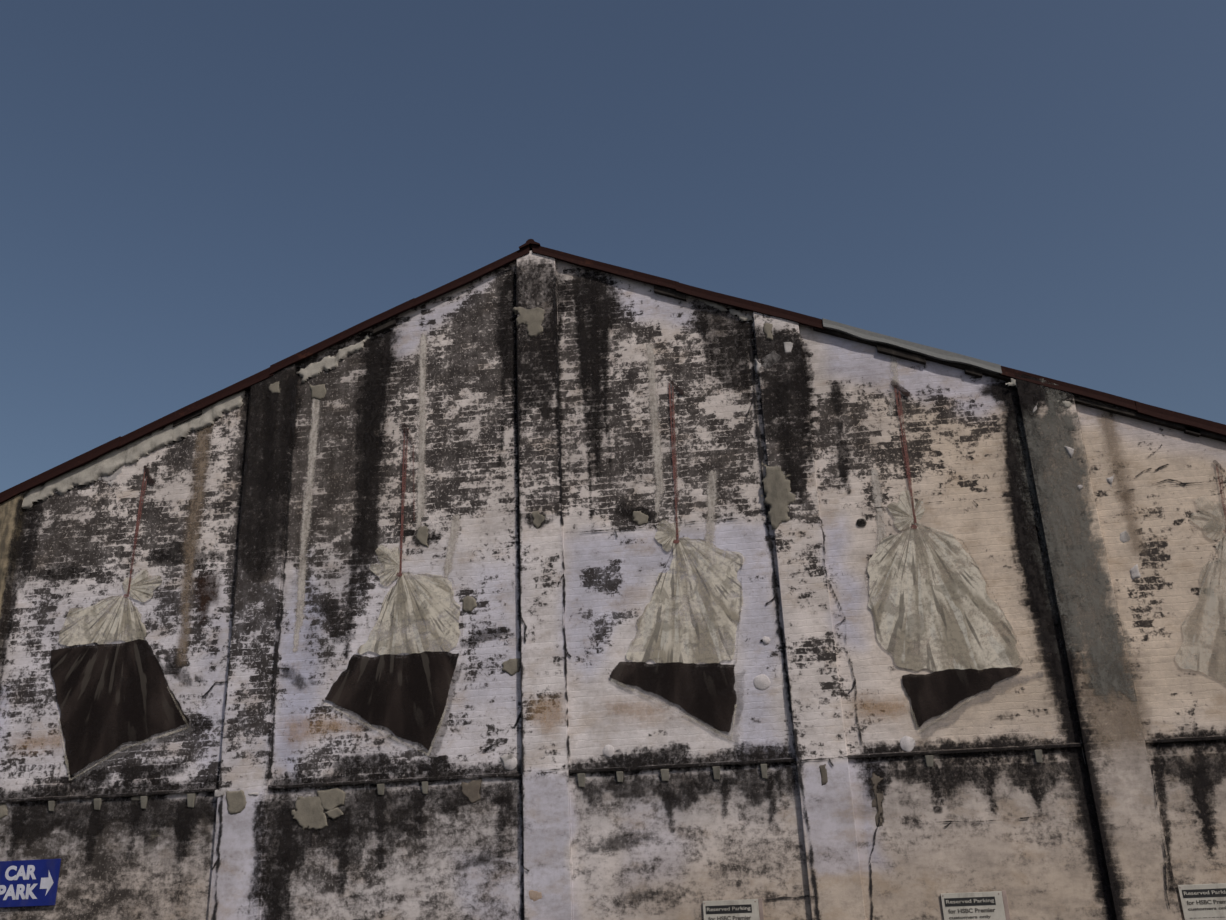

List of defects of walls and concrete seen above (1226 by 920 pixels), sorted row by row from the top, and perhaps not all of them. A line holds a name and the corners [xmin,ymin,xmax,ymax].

damp [150,368,320,652]
damp [319,325,399,658]
damp [495,259,622,571]
damp [692,299,814,504]
peeling [754,342,793,374]
damp [831,383,851,494]
damp [854,375,1226,920]
damp [0,764,219,874]
mould [590,834,653,852]
damp [569,742,801,832]
crack [869,795,880,920]
crack [943,816,1034,827]